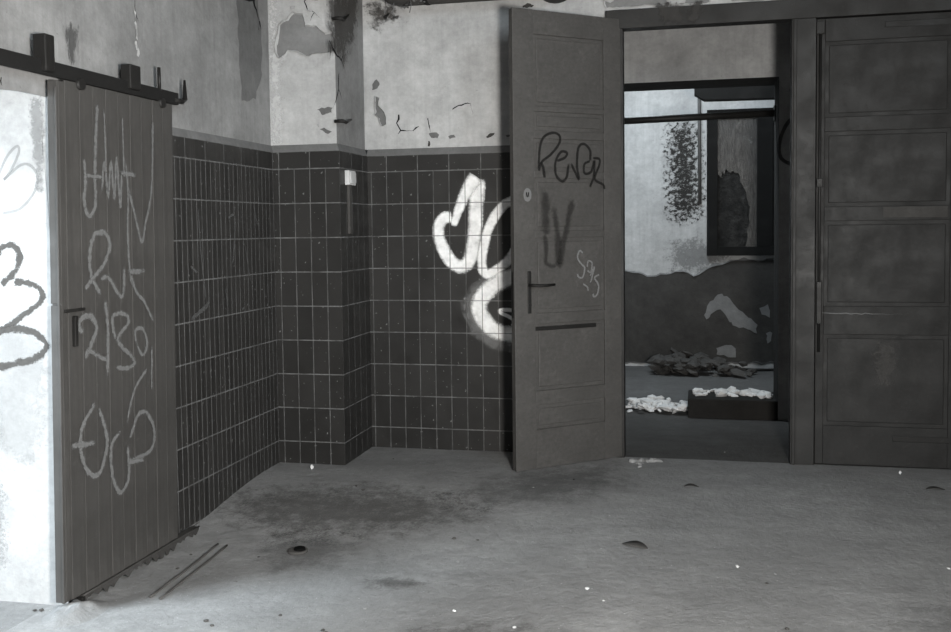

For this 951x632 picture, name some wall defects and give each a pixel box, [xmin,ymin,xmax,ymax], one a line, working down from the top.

spalling [604,0,710,9]
spalling [274,6,333,58]
peeling [625,257,774,365]